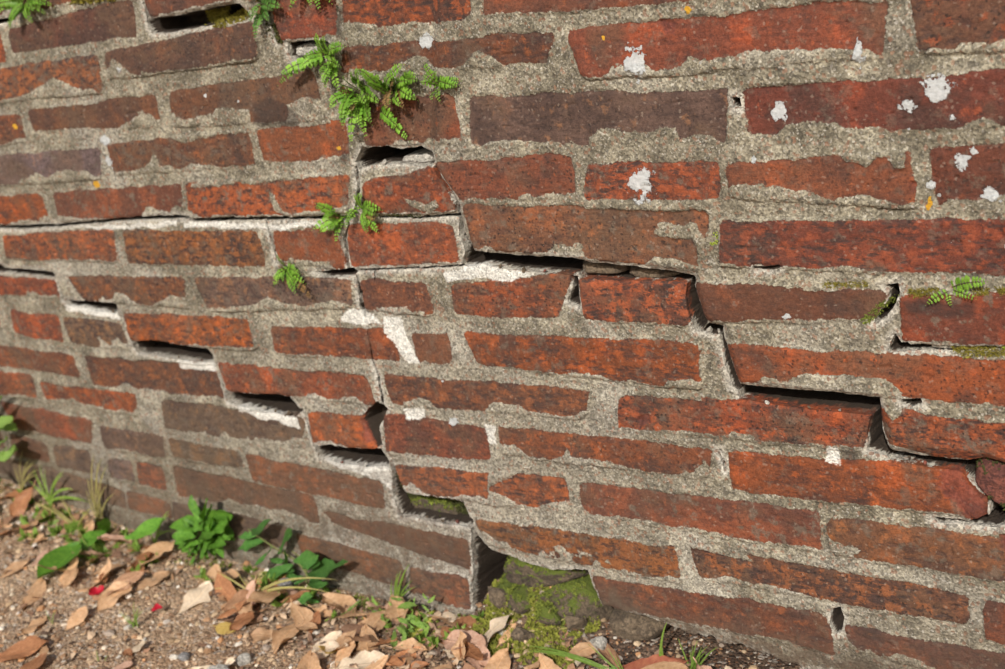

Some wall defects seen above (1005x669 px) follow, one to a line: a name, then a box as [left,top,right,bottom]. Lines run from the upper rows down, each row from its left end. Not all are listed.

water stain [925,22,1005,262]
crack [0,145,1005,612]